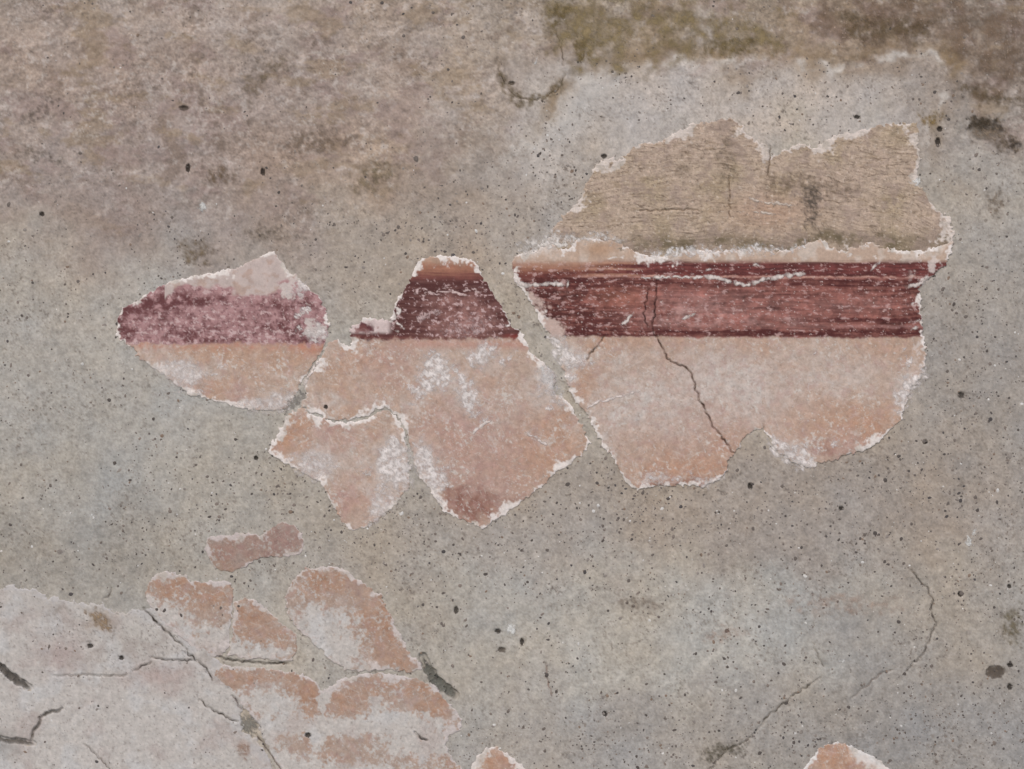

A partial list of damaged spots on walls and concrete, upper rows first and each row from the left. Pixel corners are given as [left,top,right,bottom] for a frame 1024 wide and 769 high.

water stain [546,0,783,72]
water stain [819,0,972,52]
spalling [545,115,955,247]
peeling [294,282,327,343]
peeling [407,329,511,422]
crack [643,287,731,451]
peeling [363,435,453,526]
peeling [769,435,837,471]
spalling [0,663,28,687]
crack [140,611,283,678]
spalling [423,659,455,695]
crack [0,710,57,744]